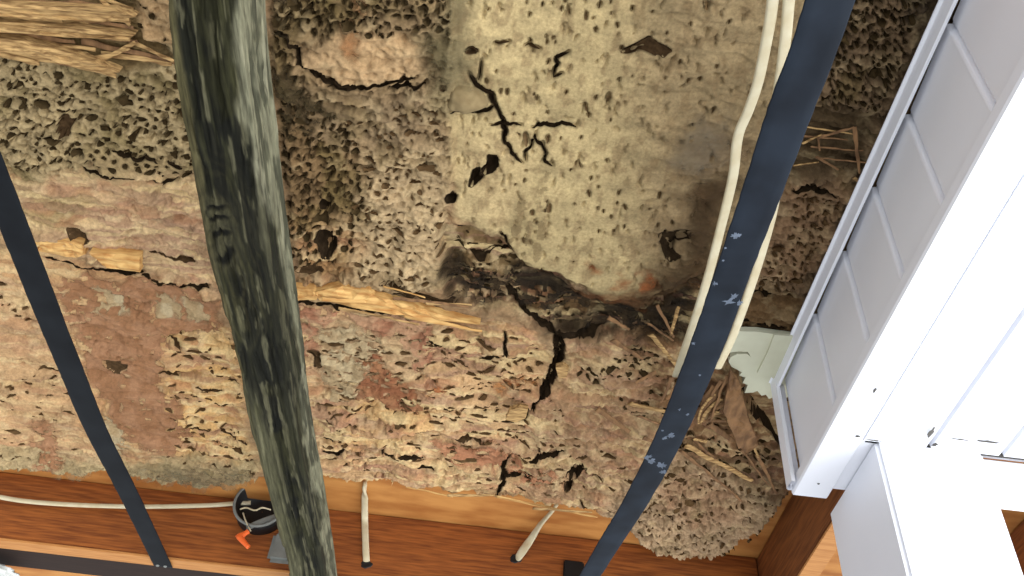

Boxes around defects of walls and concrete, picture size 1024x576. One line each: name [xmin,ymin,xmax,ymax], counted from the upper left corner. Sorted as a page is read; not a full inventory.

spalling [0,58,192,178]
crack [274,31,426,91]
spalling [272,0,449,59]
crack [450,40,576,166]
crack [45,250,209,292]
spalling [277,101,692,417]
crack [453,224,606,423]
crack [455,433,564,495]
spalling [638,397,779,556]